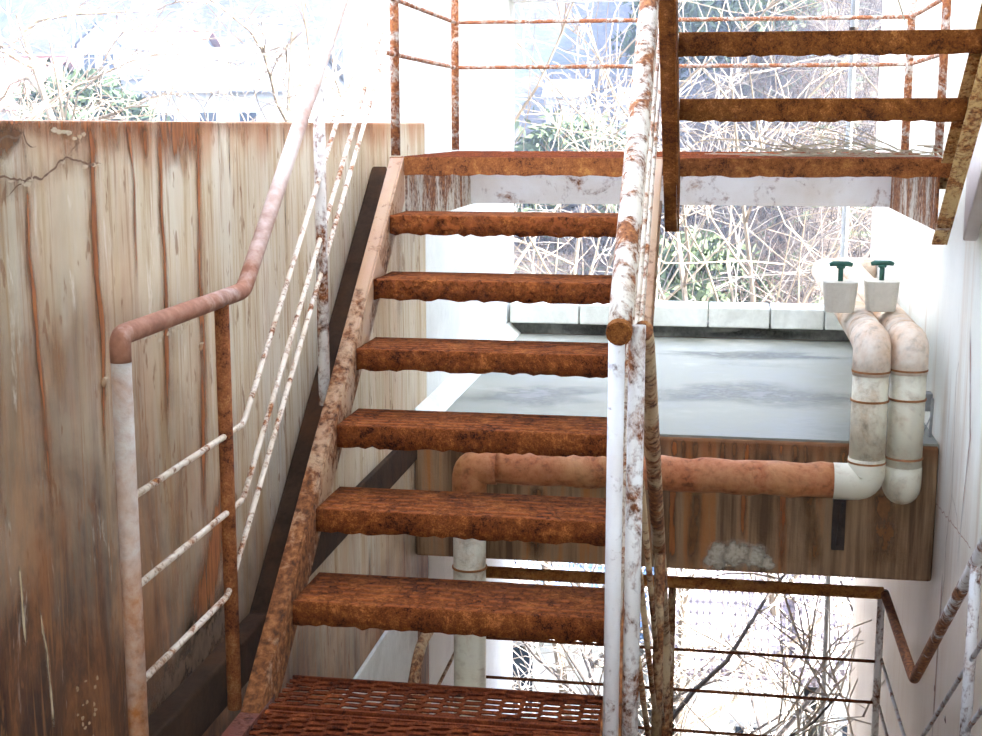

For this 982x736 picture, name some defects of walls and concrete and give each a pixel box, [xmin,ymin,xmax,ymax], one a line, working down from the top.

corrosion [26,192,50,486]
crack [0,125,103,198]
corrosion [0,121,203,440]
corrosion [193,491,222,623]